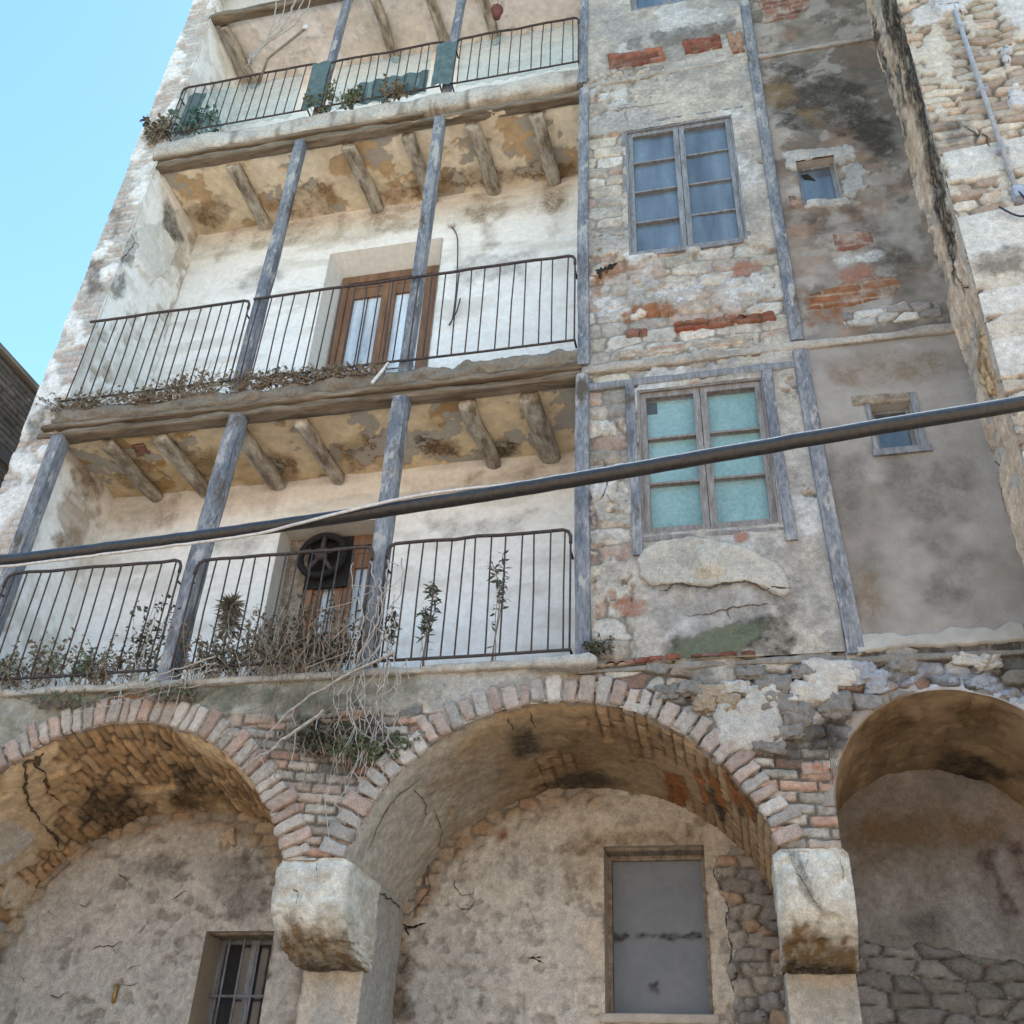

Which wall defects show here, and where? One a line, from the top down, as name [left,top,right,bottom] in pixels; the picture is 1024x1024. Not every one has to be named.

water stain [772,66,892,157]
flaking render [833,230,885,264]
flaking render [806,276,942,330]
crack [650,580,791,619]
water stain [747,596,796,655]
crack [22,752,59,849]
water stain [547,772,612,789]
crack [368,778,475,919]
water stain [783,961,847,974]